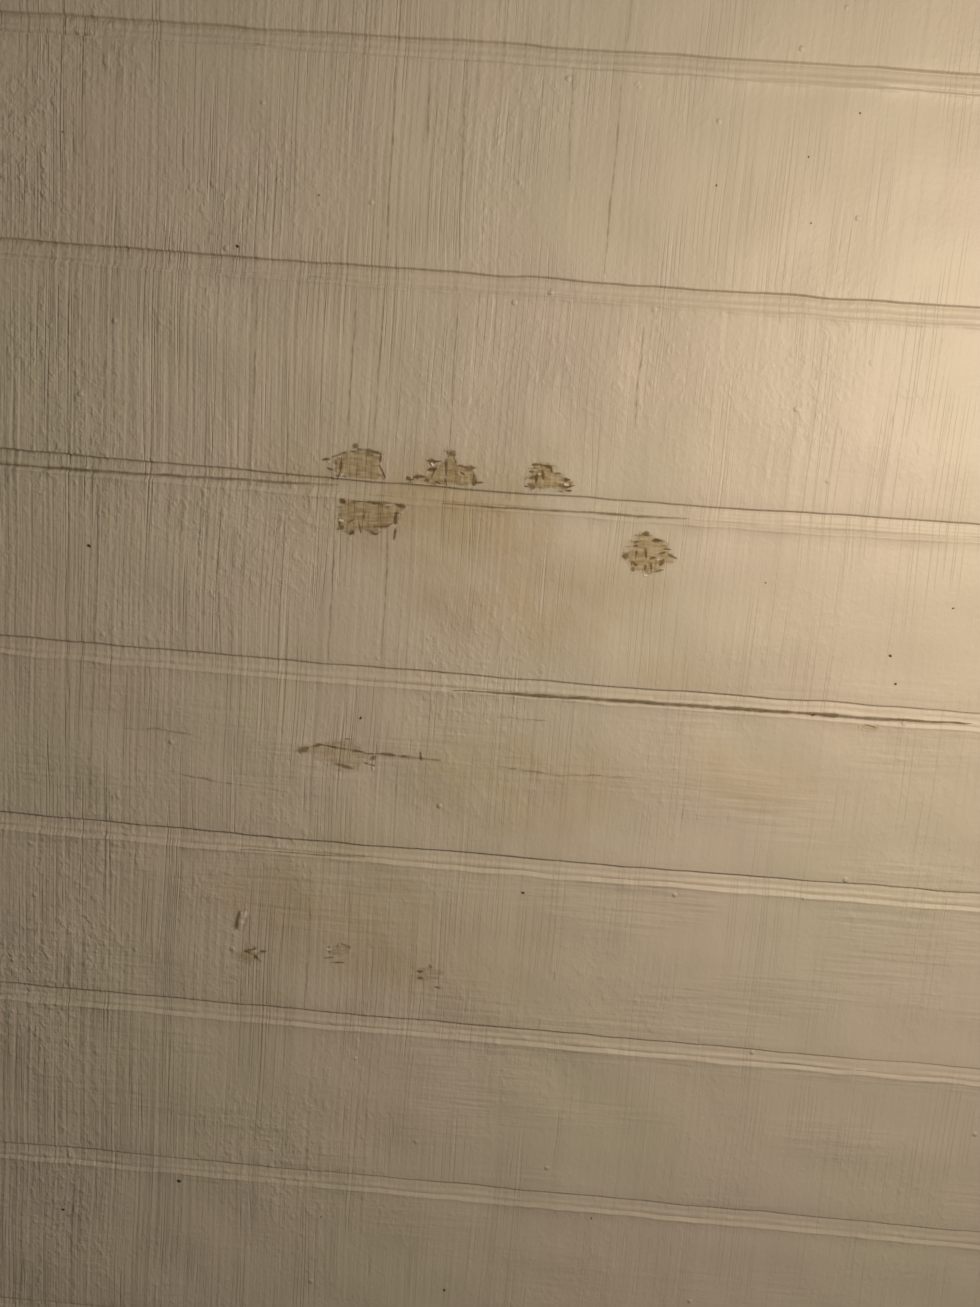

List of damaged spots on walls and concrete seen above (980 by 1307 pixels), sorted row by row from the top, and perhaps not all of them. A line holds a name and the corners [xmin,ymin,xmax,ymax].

peeling [322,444,389,482]
peeling [407,448,484,488]
peeling [521,460,575,494]
peeling [334,499,408,540]
peeling [622,532,678,576]
crack [453,690,972,724]
peeling [297,737,422,772]